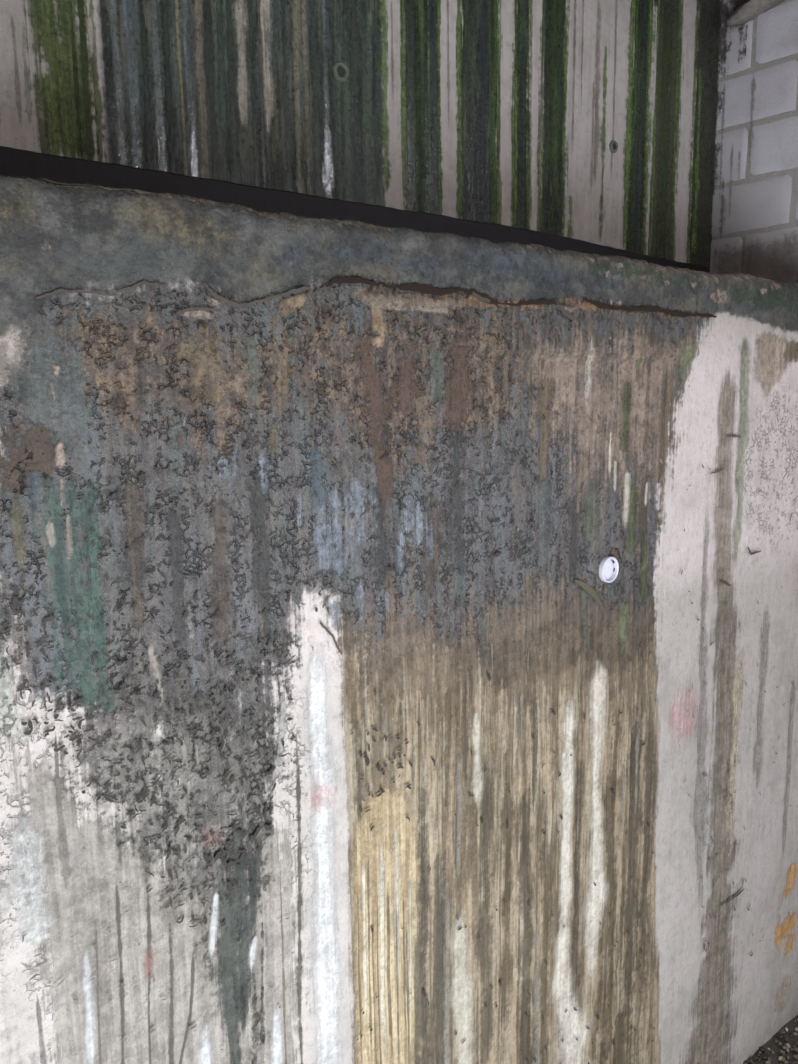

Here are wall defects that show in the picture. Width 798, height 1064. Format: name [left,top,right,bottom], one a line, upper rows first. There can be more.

leakage [34,0,500,224]
leakage [513,0,601,236]
leakage [626,0,681,260]
spalling [352,288,457,313]
leakage [756,334,798,395]
leakage [672,373,744,1064]
leakage [753,611,770,786]
leakage [782,683,795,853]
leakage [308,656,341,1064]
rust [776,912,796,956]
rust [782,864,797,899]
leakage [37,1002,47,1064]